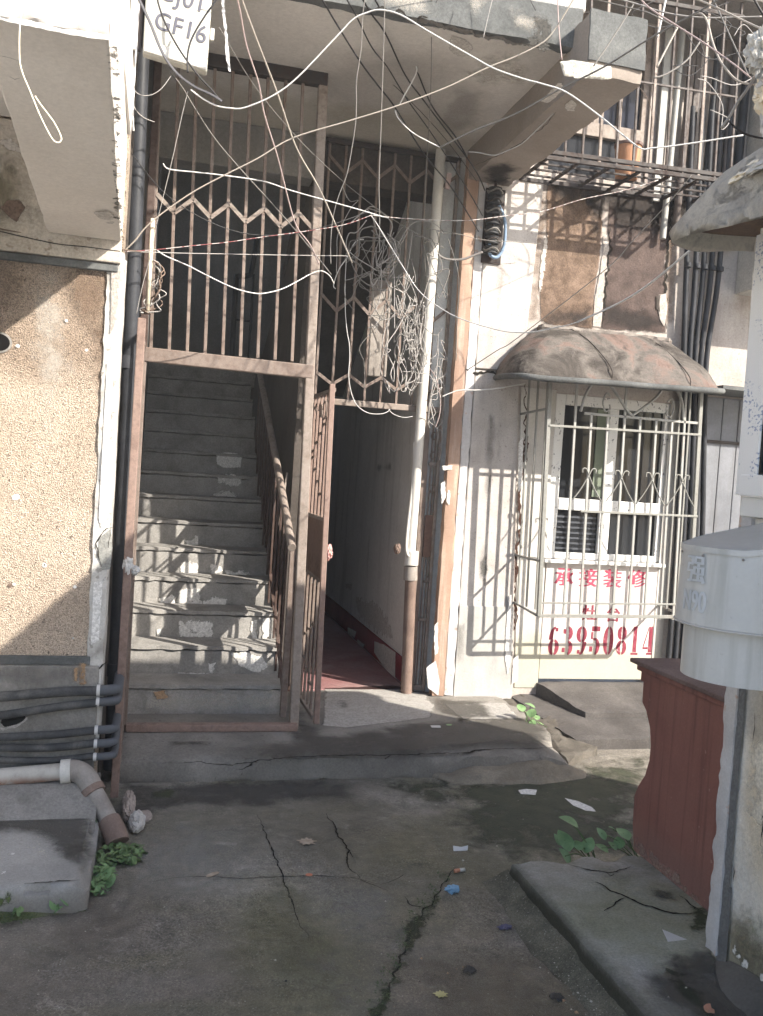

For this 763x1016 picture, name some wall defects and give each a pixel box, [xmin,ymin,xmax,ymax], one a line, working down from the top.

peeling [213,452,242,497]
crack [513,385,529,631]
peeling [180,561,198,573]
peeling [210,563,251,575]
peeling [159,588,227,605]
peeling [179,619,213,637]
peeling [250,618,272,639]
peeling [230,651,268,673]
crack [185,747,561,770]
crack [151,814,454,936]
crack [569,864,696,914]
crack [381,940,407,1011]